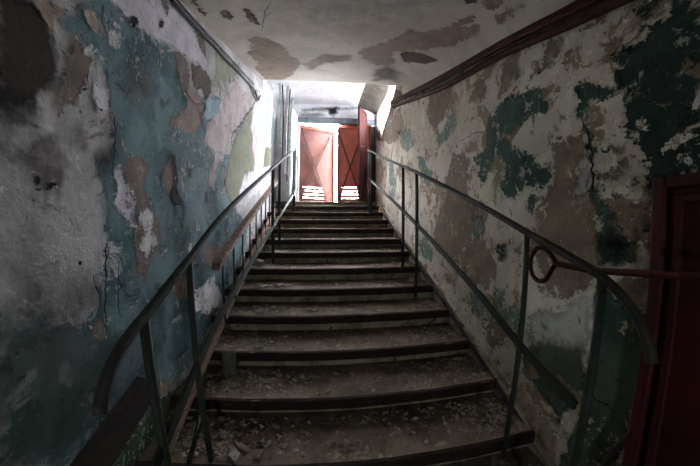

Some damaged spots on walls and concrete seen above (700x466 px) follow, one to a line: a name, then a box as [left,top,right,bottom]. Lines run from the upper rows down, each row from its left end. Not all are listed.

leakage [0,0,63,126]
flaking render [358,15,480,66]
peeling [10,0,301,423]
peeling [418,0,700,362]
crack [582,121,597,194]
crack [92,243,121,333]
peeling [522,341,584,424]
peeling [113,406,155,466]